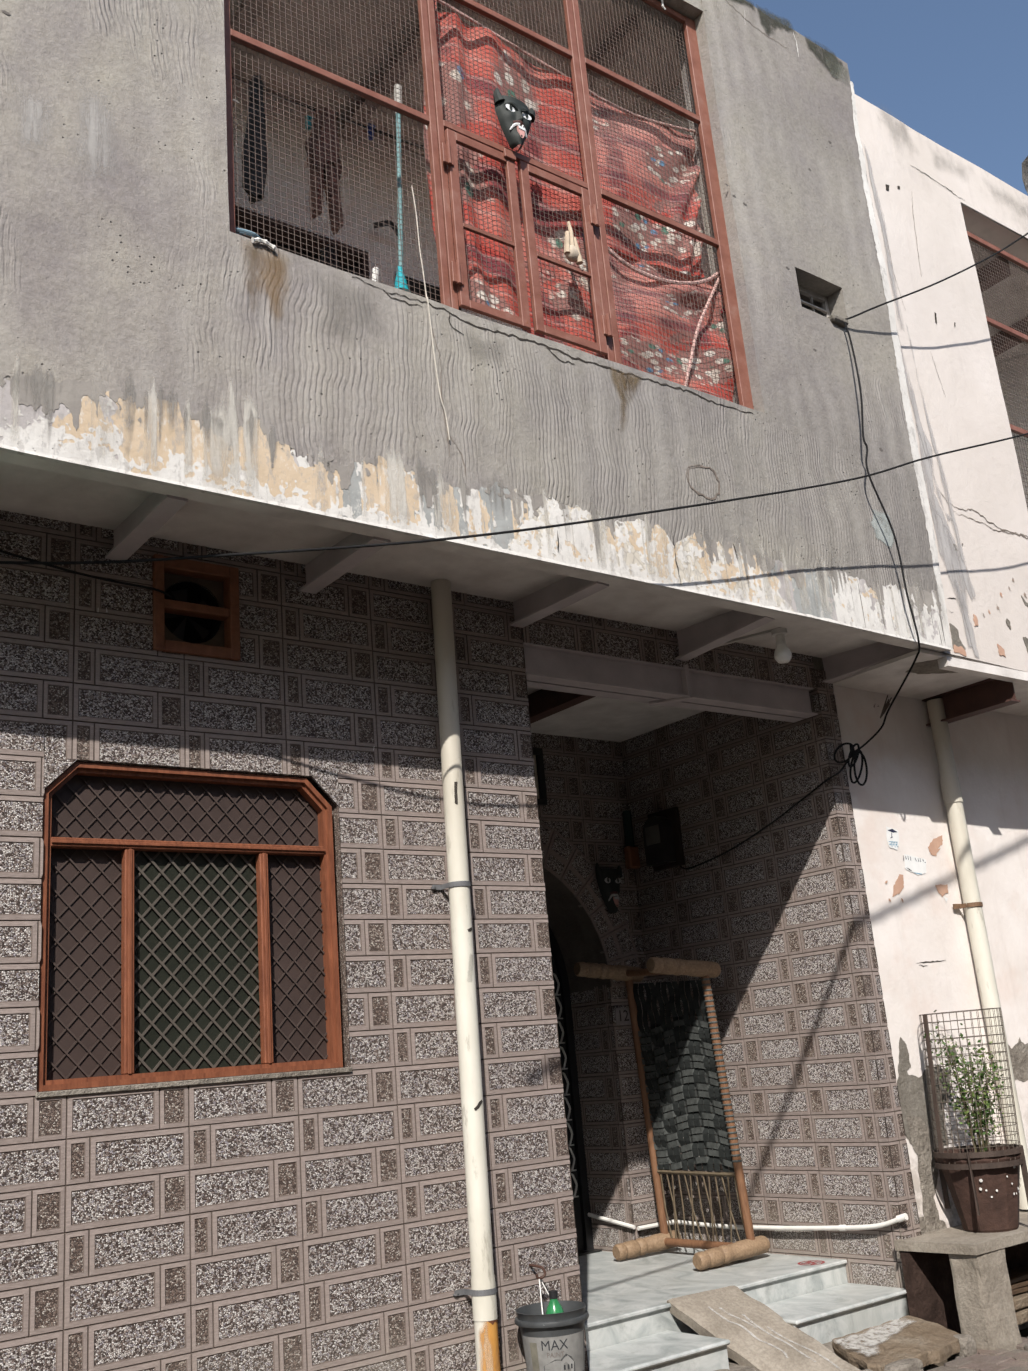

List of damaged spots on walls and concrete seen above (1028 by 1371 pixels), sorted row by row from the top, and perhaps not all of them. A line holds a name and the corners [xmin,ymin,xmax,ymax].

peeling [0,361,1028,674]
peeling [928,835,943,856]
peeling [885,874,904,902]
peeling [935,884,948,897]
rust [480,1319,501,1371]